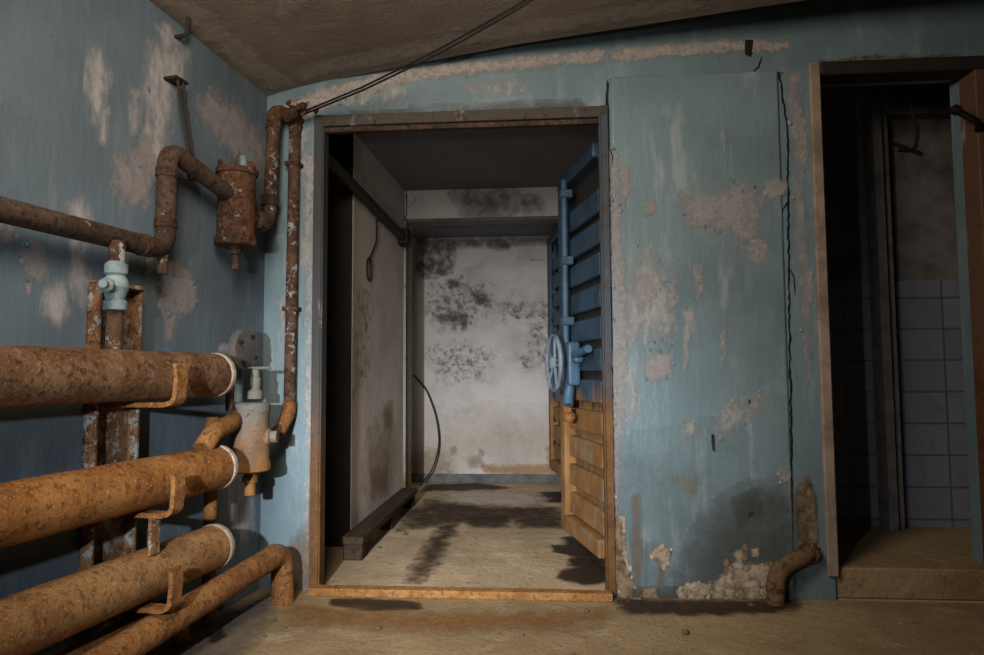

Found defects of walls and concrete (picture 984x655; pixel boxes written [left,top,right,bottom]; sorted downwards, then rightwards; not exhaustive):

peeling [0,223,50,293]
peeling [144,257,198,339]
damp [415,237,547,328]
damp [398,483,605,585]
spalling [776,467,820,549]